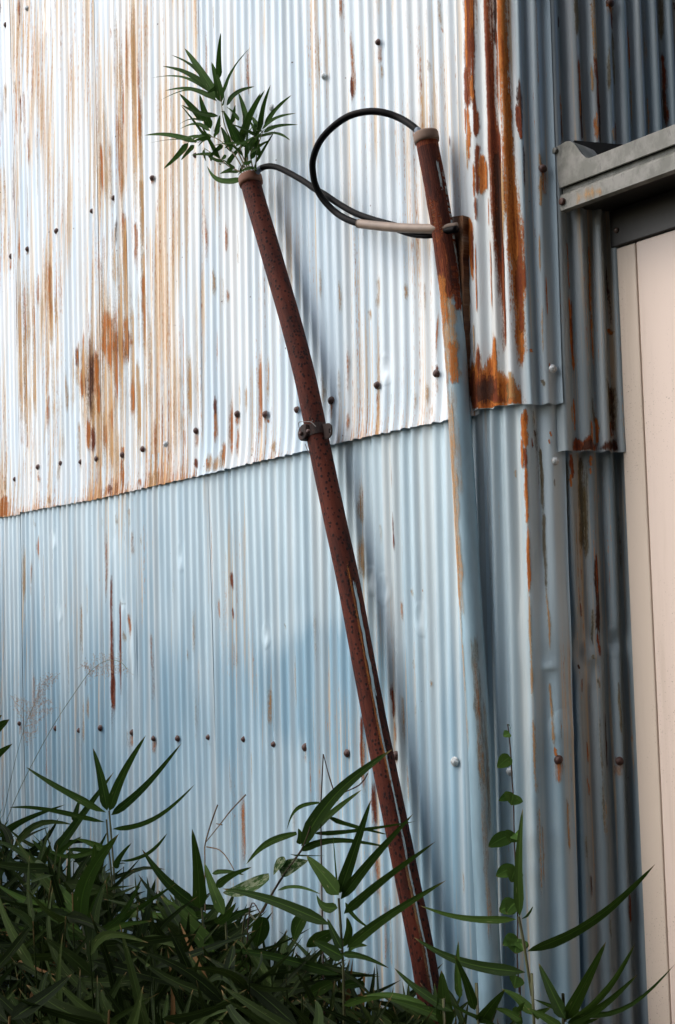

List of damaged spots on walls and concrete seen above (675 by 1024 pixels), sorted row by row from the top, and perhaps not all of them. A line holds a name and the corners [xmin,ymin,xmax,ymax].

rust [538,154,547,205]
rust [16,12,153,493]
rust [416,0,543,694]
rust [178,365,192,445]
rust [194,398,239,470]
rust [246,363,269,431]
rust [569,380,618,487]
rust [0,481,16,516]
rust [106,576,131,710]
rust [390,687,404,735]